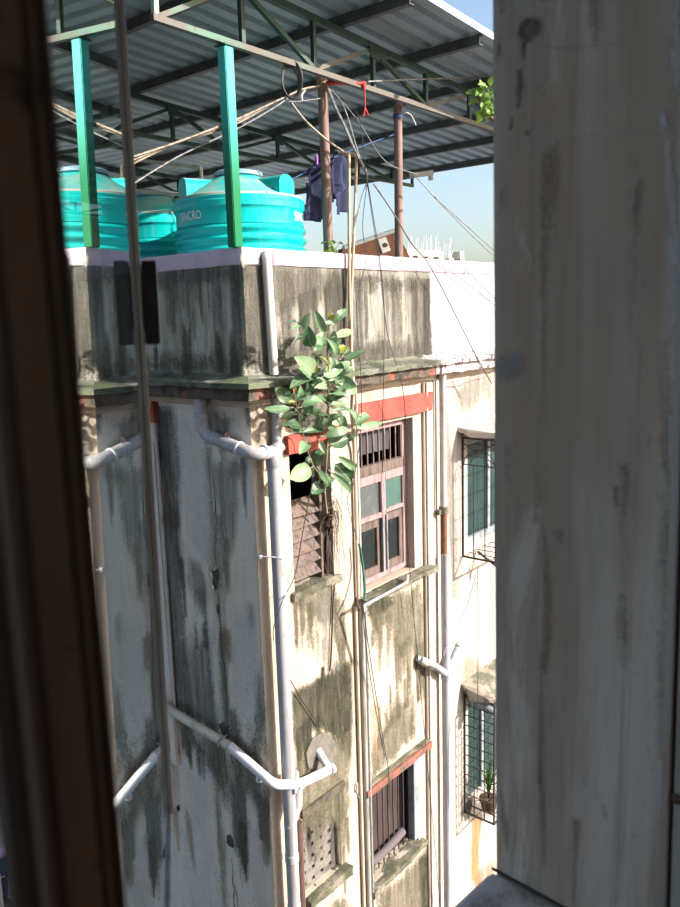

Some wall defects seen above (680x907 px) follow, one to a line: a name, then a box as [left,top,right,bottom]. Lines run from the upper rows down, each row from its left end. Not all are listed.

leakage [158,253,433,375]
leakage [157,406,253,733]
leakage [294,594,346,693]
leakage [370,608,424,755]
leakage [296,716,335,777]
leakage [187,741,225,905]
crack [231,826,250,907]
leakage [238,820,247,886]
leakage [258,796,270,865]
corrosion [471,815,493,886]